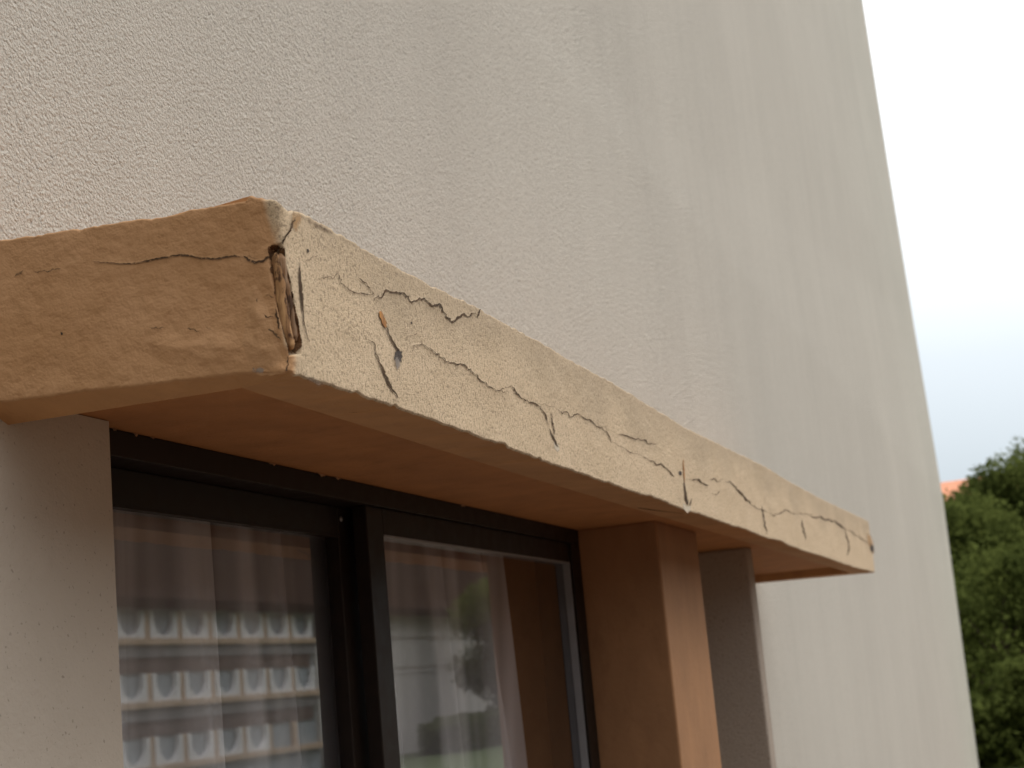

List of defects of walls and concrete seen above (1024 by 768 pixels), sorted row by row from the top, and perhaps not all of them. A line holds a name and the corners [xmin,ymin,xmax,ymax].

crack [107,217,296,264]
crack [256,256,481,371]
crack [366,339,398,397]
crack [407,333,867,556]